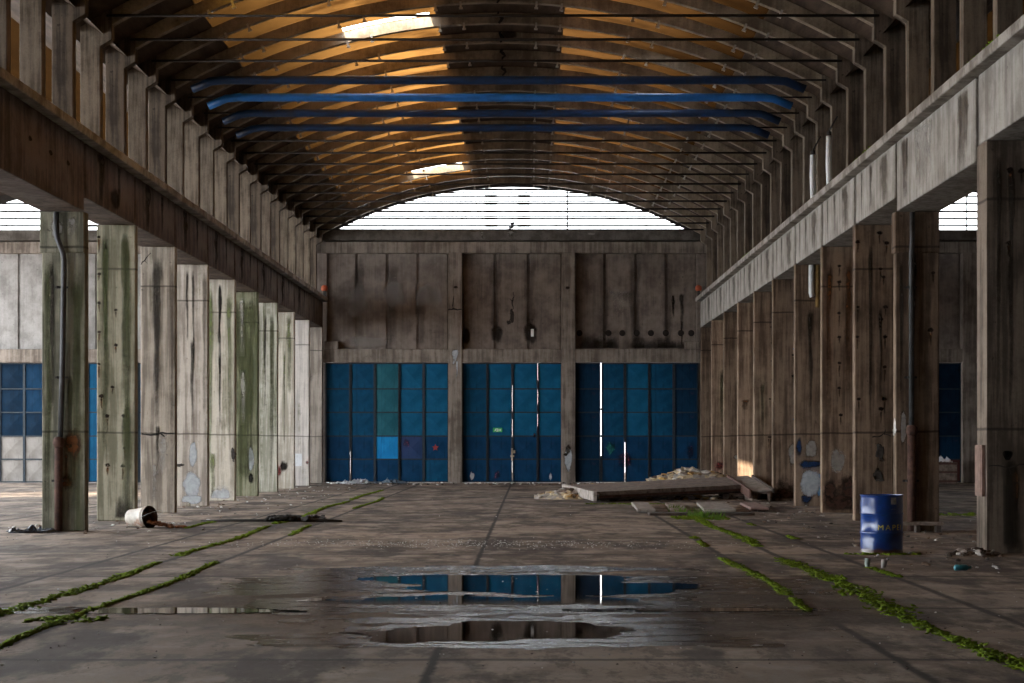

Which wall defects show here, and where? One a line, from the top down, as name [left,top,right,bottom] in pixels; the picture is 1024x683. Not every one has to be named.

water stain [153,262,222,411]
water stain [236,303,291,458]
water stain [105,407,132,518]
water stain [824,450,853,510]